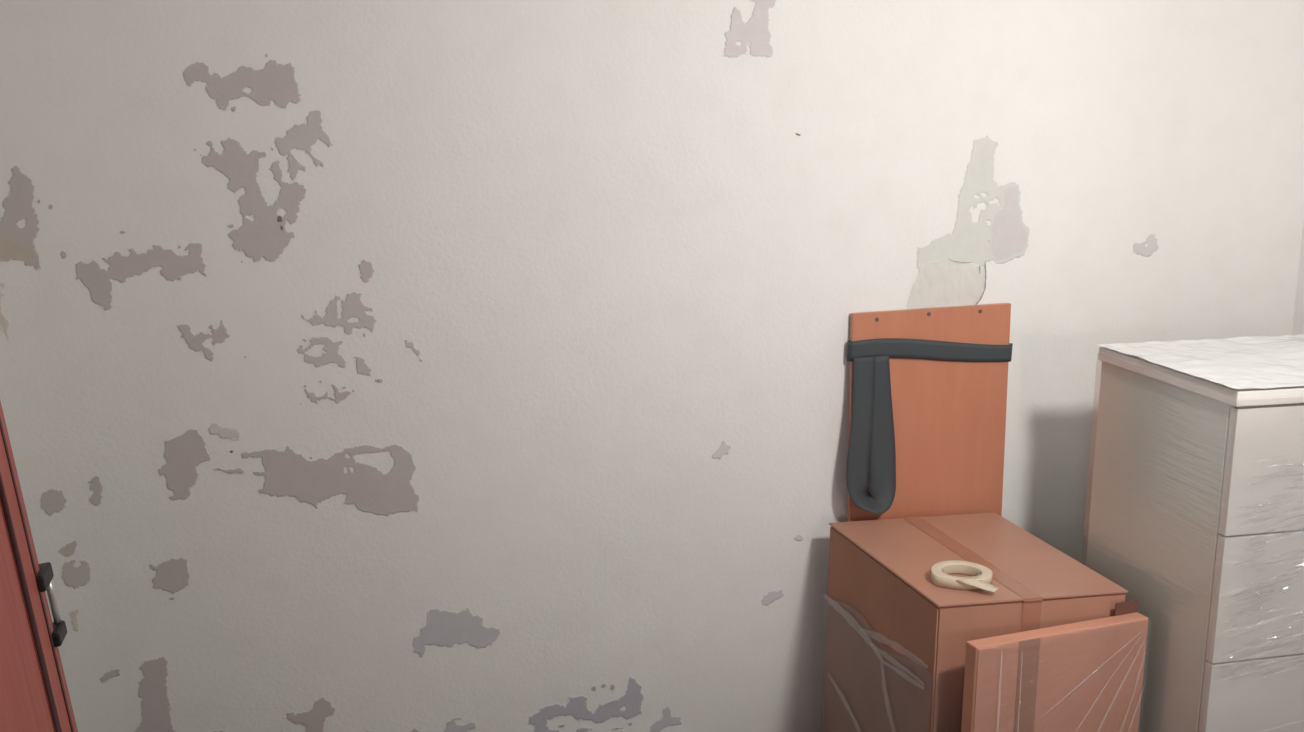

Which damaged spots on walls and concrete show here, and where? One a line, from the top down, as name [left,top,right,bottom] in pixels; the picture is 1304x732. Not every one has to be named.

peeling [723,0,777,58]
peeling [183,53,334,263]
peeling [0,165,54,271]
peeling [916,135,1030,274]
peeling [60,230,207,311]
peeling [296,259,384,405]
peeling [158,422,420,517]
peeling [149,557,192,600]
peeling [412,607,502,657]
peeling [134,656,176,732]
peeling [282,696,336,732]
peeling [528,676,683,732]